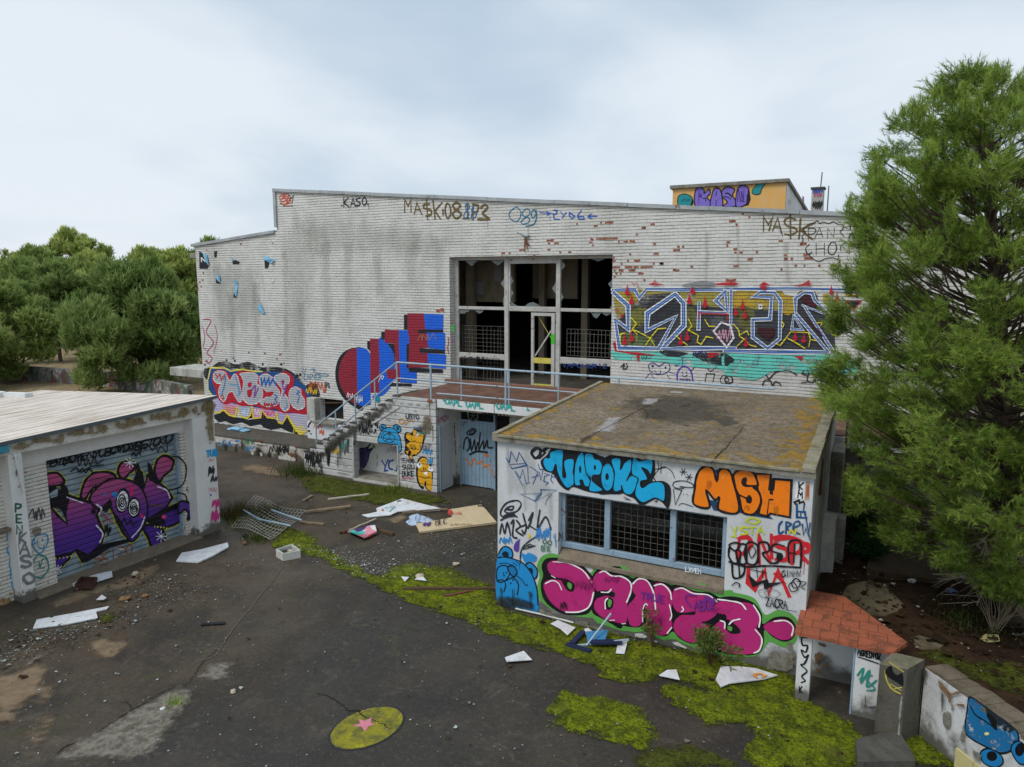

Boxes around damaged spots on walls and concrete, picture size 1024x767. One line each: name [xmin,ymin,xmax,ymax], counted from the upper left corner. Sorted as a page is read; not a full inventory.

peeling [589,221,693,281]
damp [597,417,619,431]